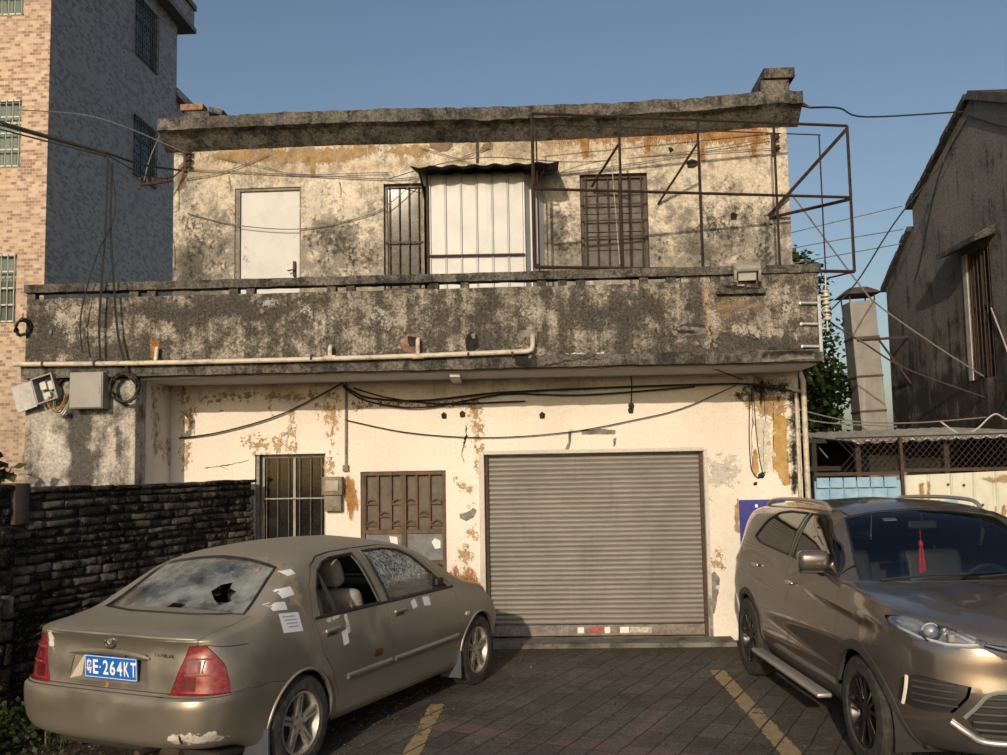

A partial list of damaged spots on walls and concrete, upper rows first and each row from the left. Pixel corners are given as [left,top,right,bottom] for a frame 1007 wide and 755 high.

leakage [193,124,430,180]
corrosion [534,127,770,161]
leakage [685,198,776,267]
leakage [362,307,407,333]
leakage [518,296,558,322]
peeling [240,410,299,456]
flaking render [703,391,790,489]
peeling [315,395,485,565]